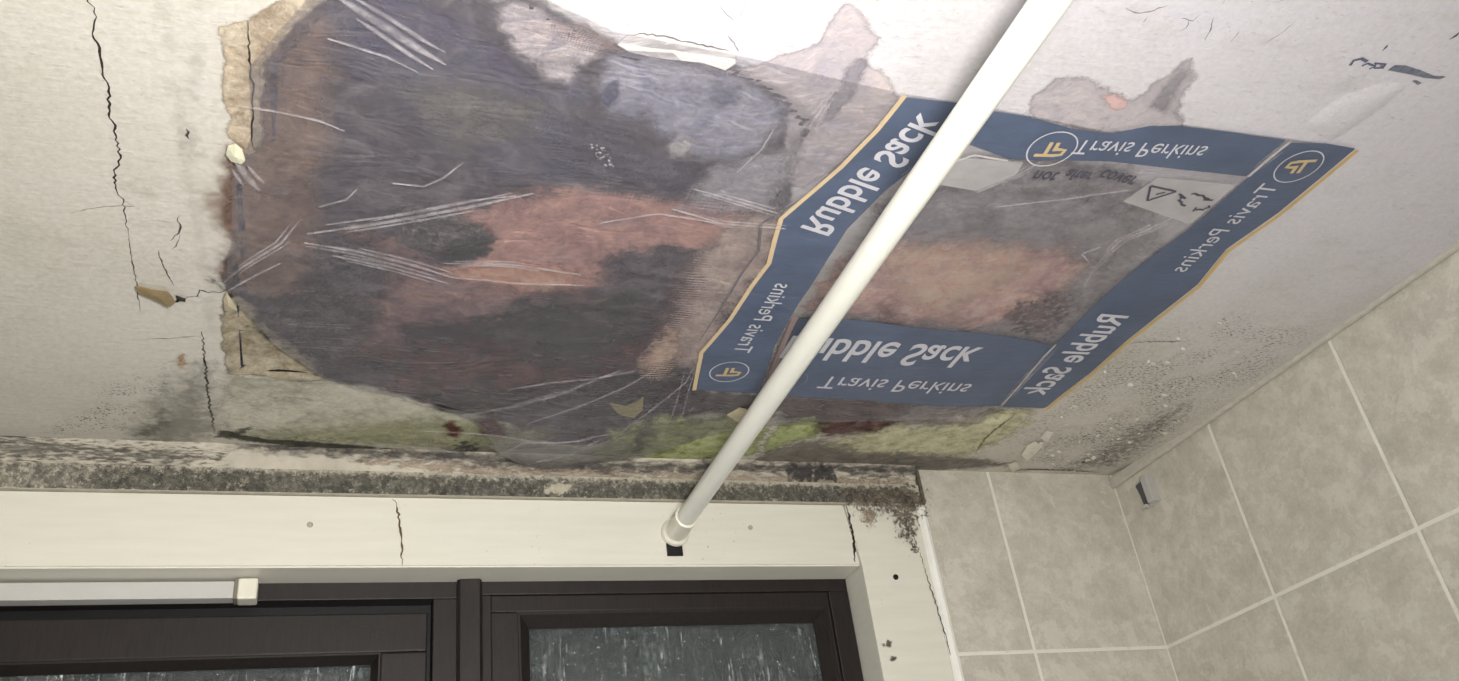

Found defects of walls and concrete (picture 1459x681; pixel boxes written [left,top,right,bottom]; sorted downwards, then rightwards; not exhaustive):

peeling [1029,59,1195,134]
crack [71,0,225,434]
flaking render [210,0,898,449]
flaking render [777,160,1157,437]
leakage [0,379,738,500]
crack [392,499,403,563]
leakage [712,406,1035,553]
peeling [1008,319,1286,473]